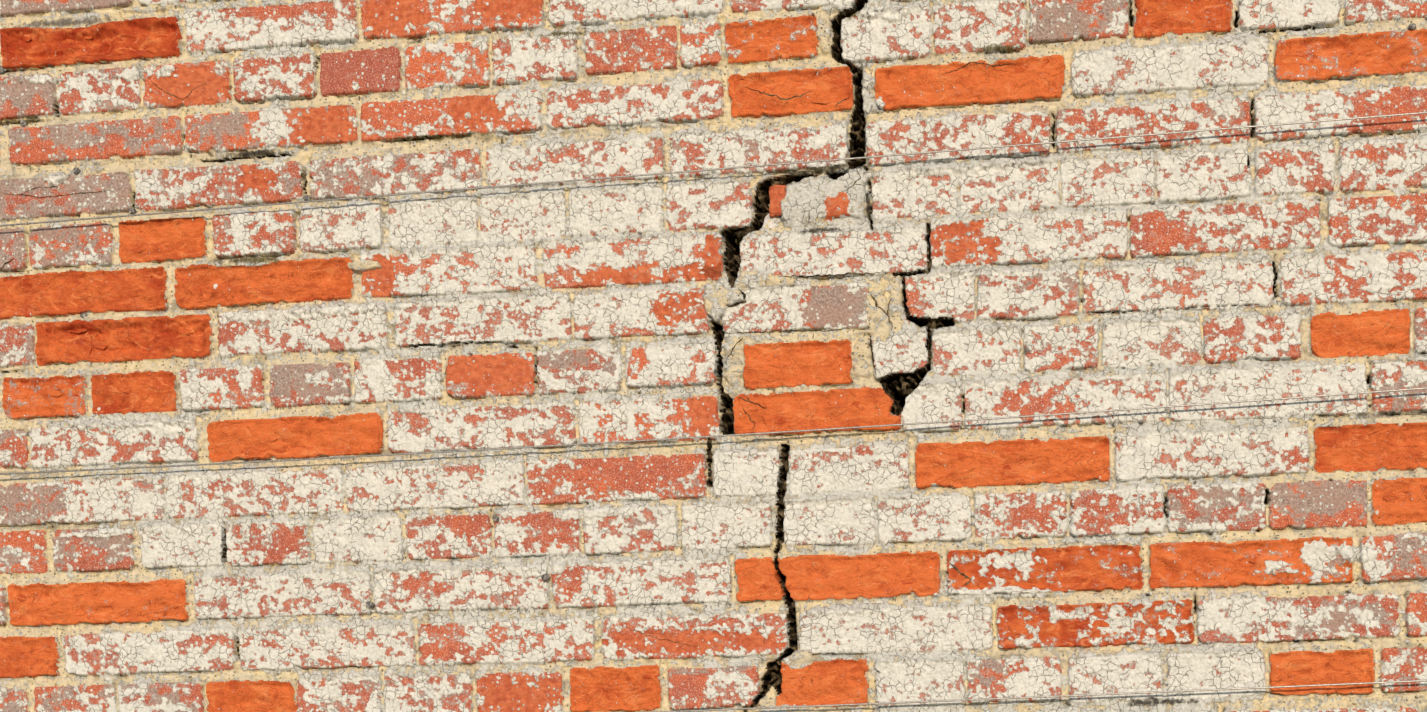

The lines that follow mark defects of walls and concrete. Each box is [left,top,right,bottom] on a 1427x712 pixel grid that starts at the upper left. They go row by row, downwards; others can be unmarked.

crack [706,0,955,712]